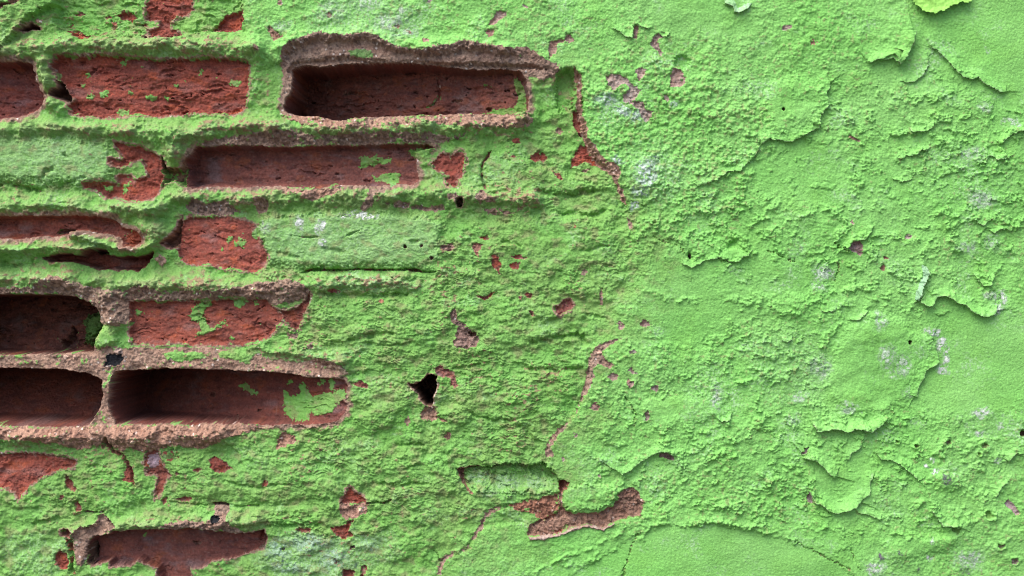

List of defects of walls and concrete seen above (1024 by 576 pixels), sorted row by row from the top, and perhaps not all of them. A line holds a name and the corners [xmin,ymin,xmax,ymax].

flaking render [105,0,194,38]
spalling [0,11,638,513]
spalling [70,502,268,576]
flaking render [330,486,368,551]
peeling [334,559,369,576]
flaking render [437,480,645,575]